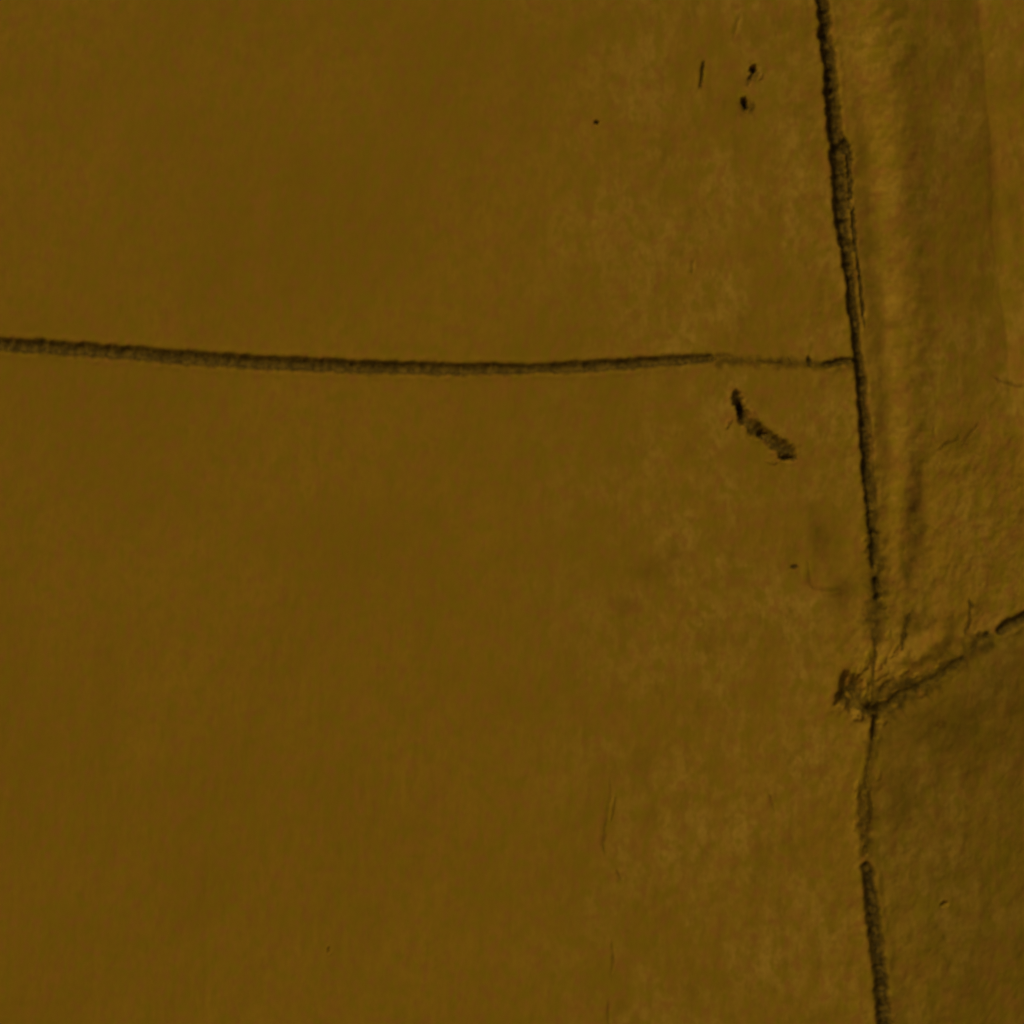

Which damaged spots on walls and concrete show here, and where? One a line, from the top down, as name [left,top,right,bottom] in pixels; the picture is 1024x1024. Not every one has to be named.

crack [0,339,716,376]
crack [807,0,911,651]
crack [889,599,1024,703]
crack [852,770,891,1024]